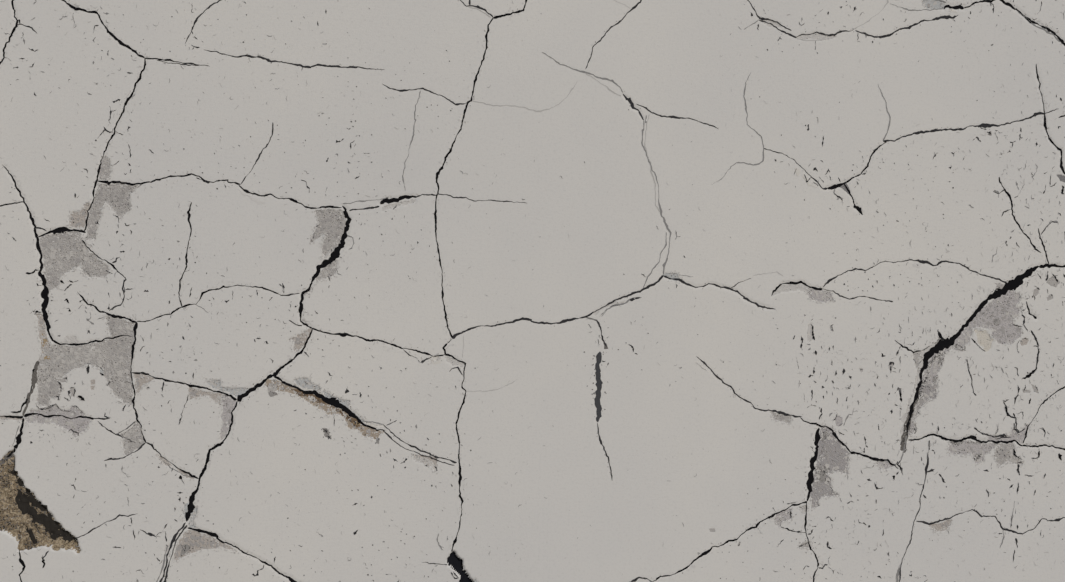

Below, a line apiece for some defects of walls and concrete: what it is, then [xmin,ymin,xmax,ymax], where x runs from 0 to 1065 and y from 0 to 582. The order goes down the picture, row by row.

crack [0,0,71,170]
peeling [40,156,141,290]
peeling [295,209,360,307]
peeling [377,199,416,213]
peeling [1033,276,1060,301]
peeling [0,314,134,438]
peeling [897,283,1029,453]
spalling [0,448,79,551]
crack [2,506,85,582]